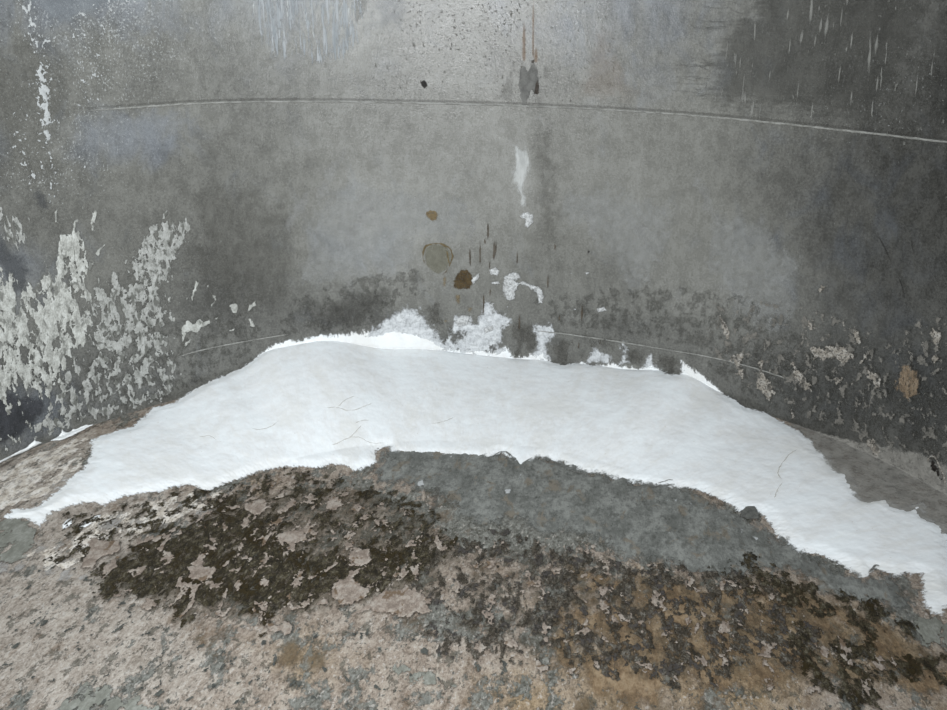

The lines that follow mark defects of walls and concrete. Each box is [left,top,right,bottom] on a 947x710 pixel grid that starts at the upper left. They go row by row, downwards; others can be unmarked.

damp [518,63,539,105]
corrosion [444,225,497,303]
peeling [0,207,218,451]
peeling [229,301,256,327]
damp [427,303,466,344]
damp [512,323,535,356]
peeling [706,299,947,459]
damp [792,424,947,534]